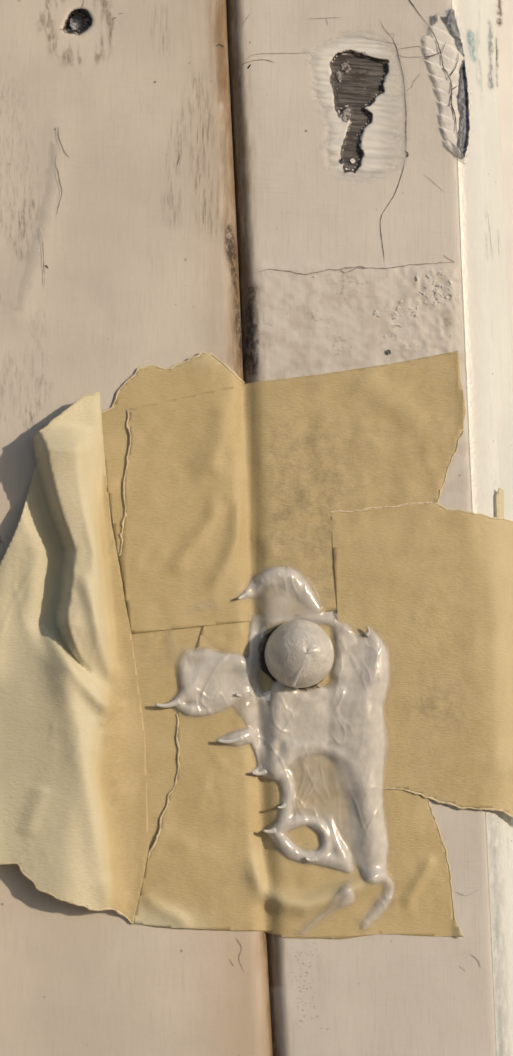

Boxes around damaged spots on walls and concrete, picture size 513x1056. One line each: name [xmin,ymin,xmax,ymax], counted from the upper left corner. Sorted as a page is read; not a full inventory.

spalling [64,9,92,35]
crack [239,53,279,69]
spalling [311,32,396,180]
crack [311,0,428,254]
spalling [422,7,472,164]